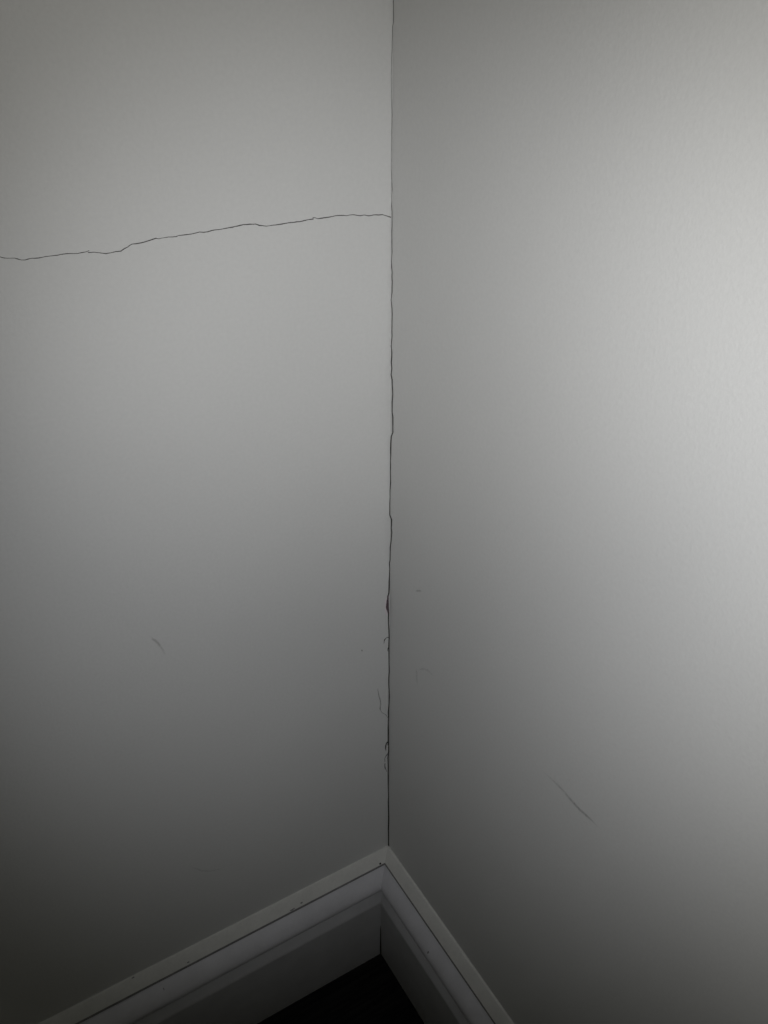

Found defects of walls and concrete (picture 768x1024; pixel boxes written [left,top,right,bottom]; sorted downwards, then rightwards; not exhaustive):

crack [1,0,394,260]
crack [384,257,393,846]